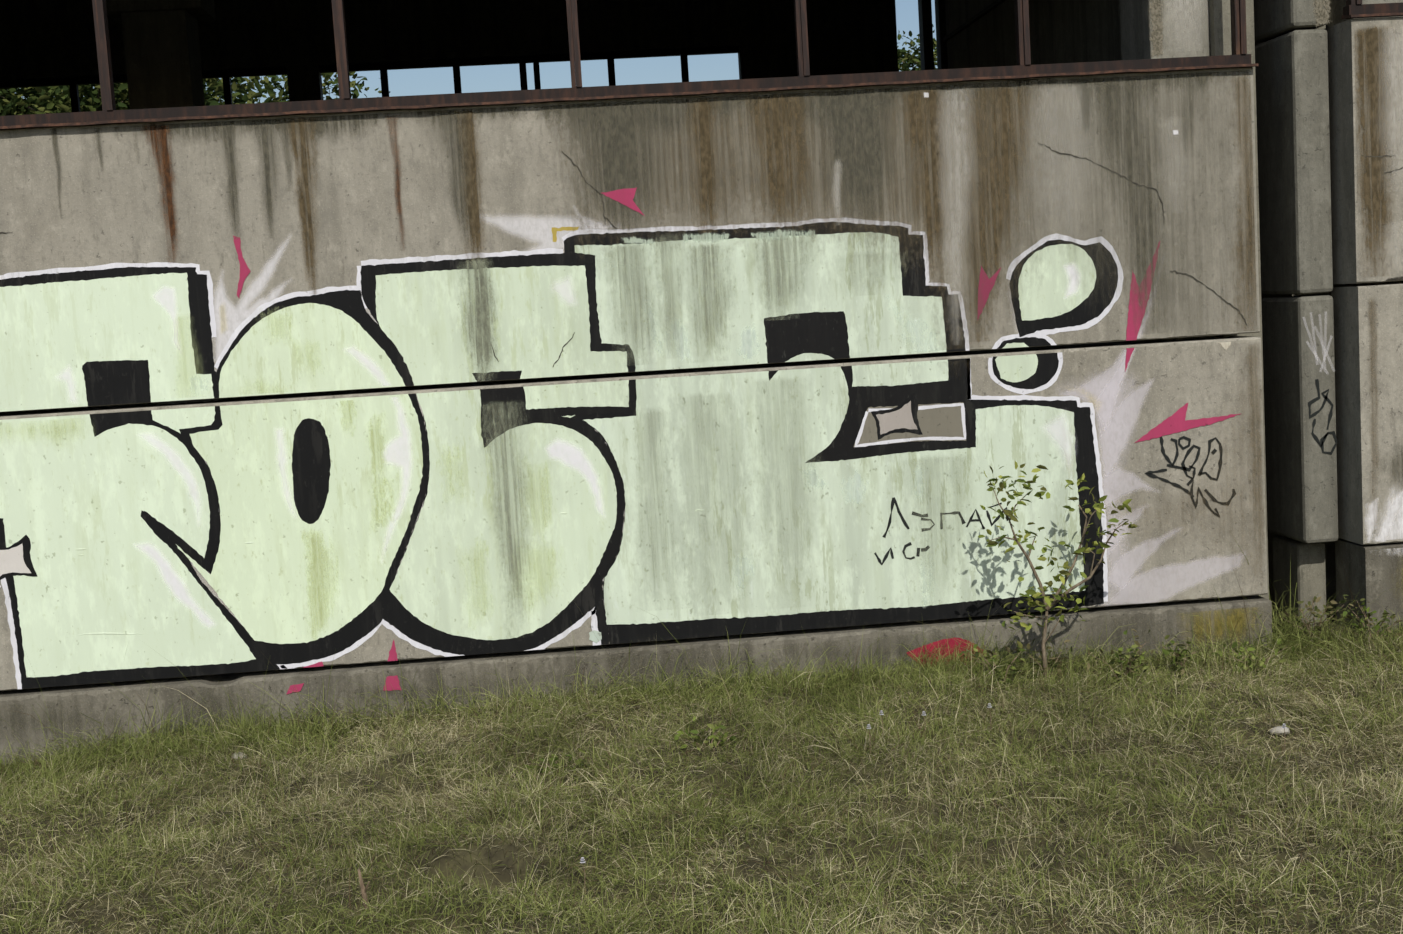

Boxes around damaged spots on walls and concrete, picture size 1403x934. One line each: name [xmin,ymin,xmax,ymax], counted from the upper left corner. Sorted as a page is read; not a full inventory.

damp [52,128,60,193]
rust [150,124,176,257]
damp [140,71,1226,381]
crack [1038,143,1165,224]
damp [490,409,521,596]